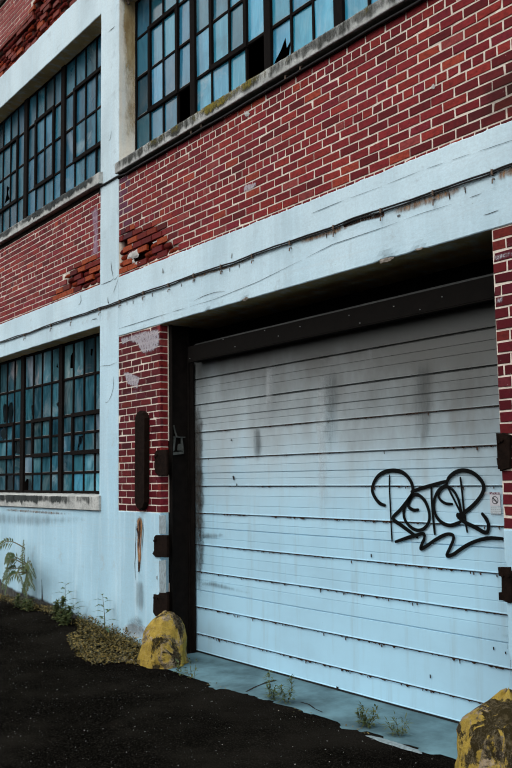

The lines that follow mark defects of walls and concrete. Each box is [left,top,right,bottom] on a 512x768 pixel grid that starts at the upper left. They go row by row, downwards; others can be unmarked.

spalling [0,0,68,73]
spalling [65,271,100,288]
spalling [120,241,178,269]
corrosion [134,517,143,578]
corrosion [204,545,498,577]
corrosion [197,571,508,616]
corrosion [197,633,483,704]
corrosion [197,606,512,670]